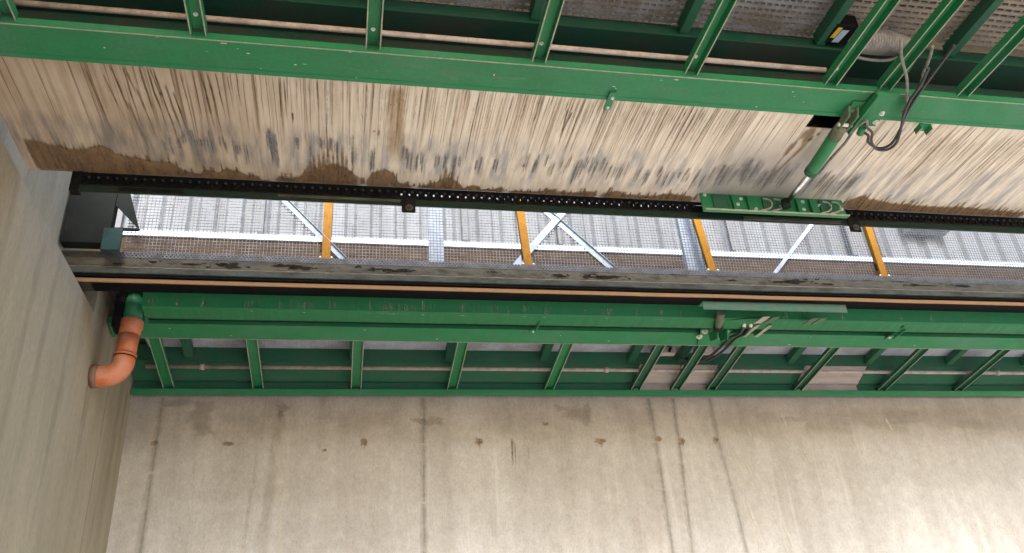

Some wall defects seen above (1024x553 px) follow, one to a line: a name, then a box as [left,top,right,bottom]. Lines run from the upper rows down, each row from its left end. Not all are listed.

water stain [26,81,697,202]